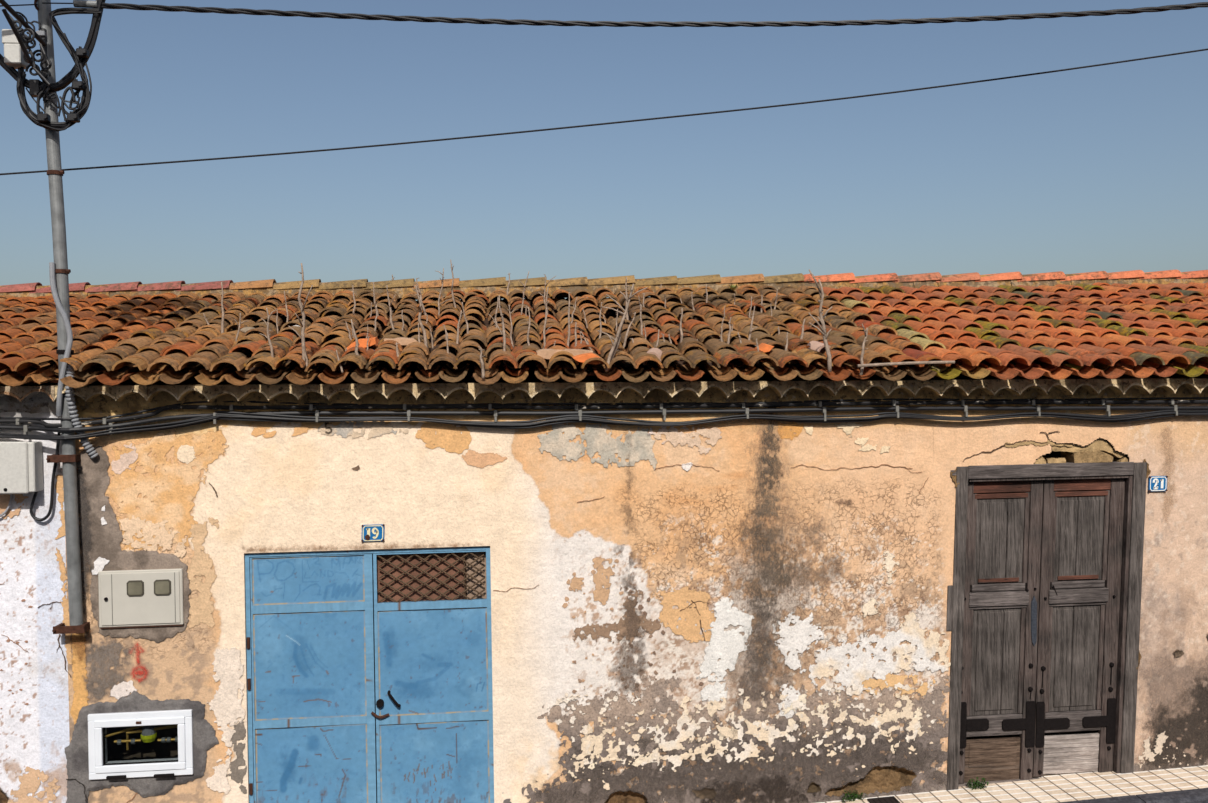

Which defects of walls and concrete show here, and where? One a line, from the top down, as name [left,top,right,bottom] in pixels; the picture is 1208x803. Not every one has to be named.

peeling [537,421,722,471]
crack [963,431,1060,462]
flaking render [1034,438,1129,464]
peeling [0,494,28,519]
water stain [522,407,950,803]
peeling [553,551,951,803]
water stain [1140,656,1208,770]
peeling [0,767,61,803]